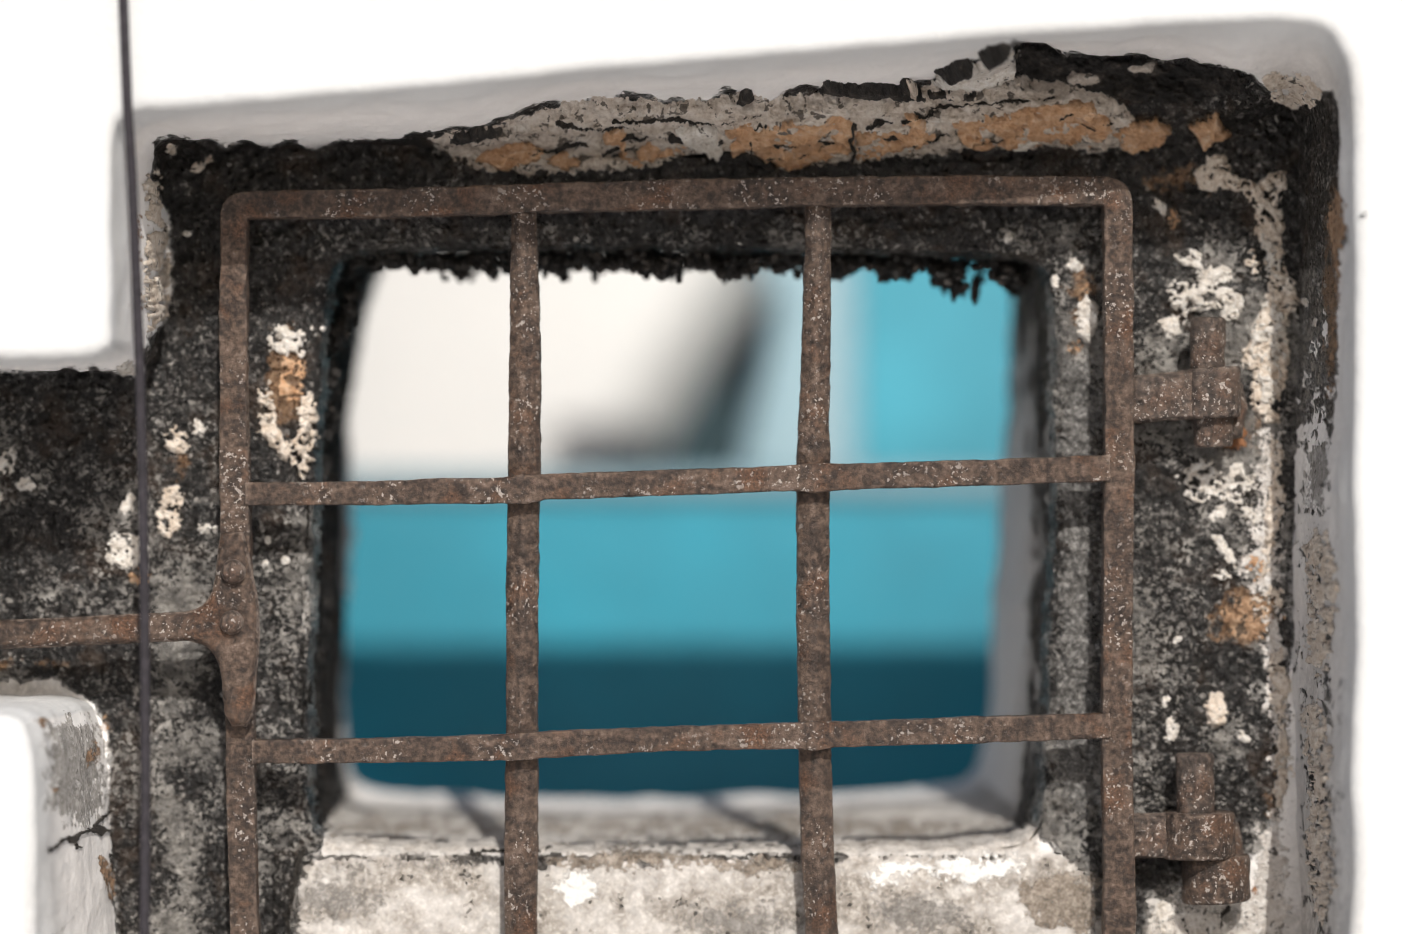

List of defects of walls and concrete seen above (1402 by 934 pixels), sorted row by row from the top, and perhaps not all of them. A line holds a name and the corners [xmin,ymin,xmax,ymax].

spalling [256,324,326,480]
damp [1052,351,1103,457]
spalling [427,42,1348,934]
damp [1048,482,1102,714]
spalling [34,712,112,829]
damp [1047,739,1101,814]
crack [47,812,124,934]
damp [299,851,470,920]
damp [538,811,801,878]
damp [682,899,803,934]
damp [881,895,974,933]
damp [1019,871,1102,934]